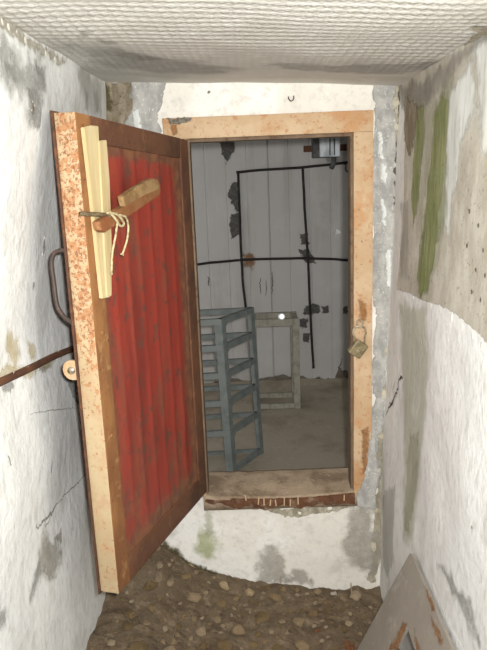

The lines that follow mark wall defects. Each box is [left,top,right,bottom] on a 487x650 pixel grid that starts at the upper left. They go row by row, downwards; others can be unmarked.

damp [0,41,45,128]
flaking render [105,82,166,133]
peeling [219,142,235,163]
damp [404,97,424,224]
peeling [228,182,239,239]
peeling [367,26,487,583]
crack [36,474,86,529]
damp [30,529,62,602]
damp [259,546,312,584]
damp [344,507,379,572]